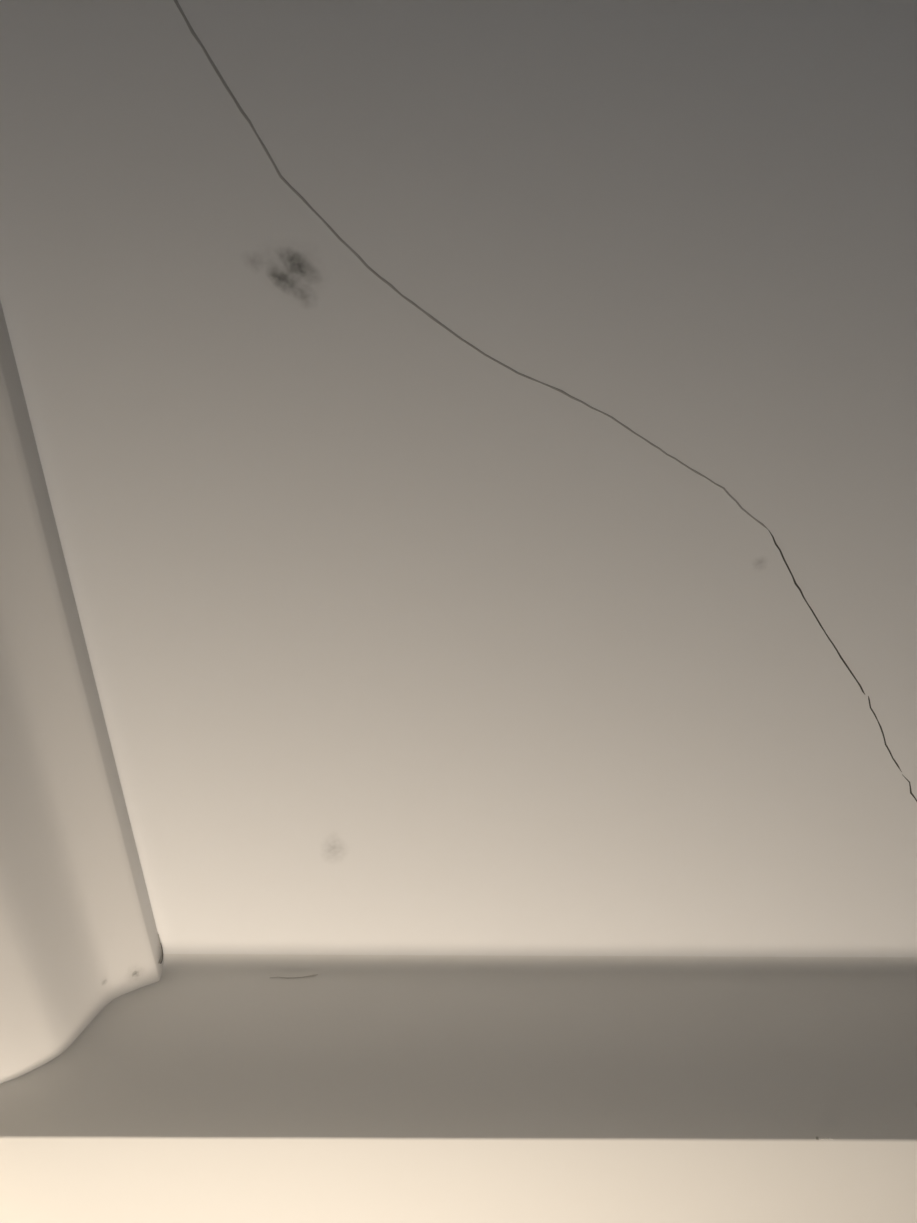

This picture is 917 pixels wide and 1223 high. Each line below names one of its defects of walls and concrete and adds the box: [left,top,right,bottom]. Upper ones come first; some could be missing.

crack [174,0,917,802]